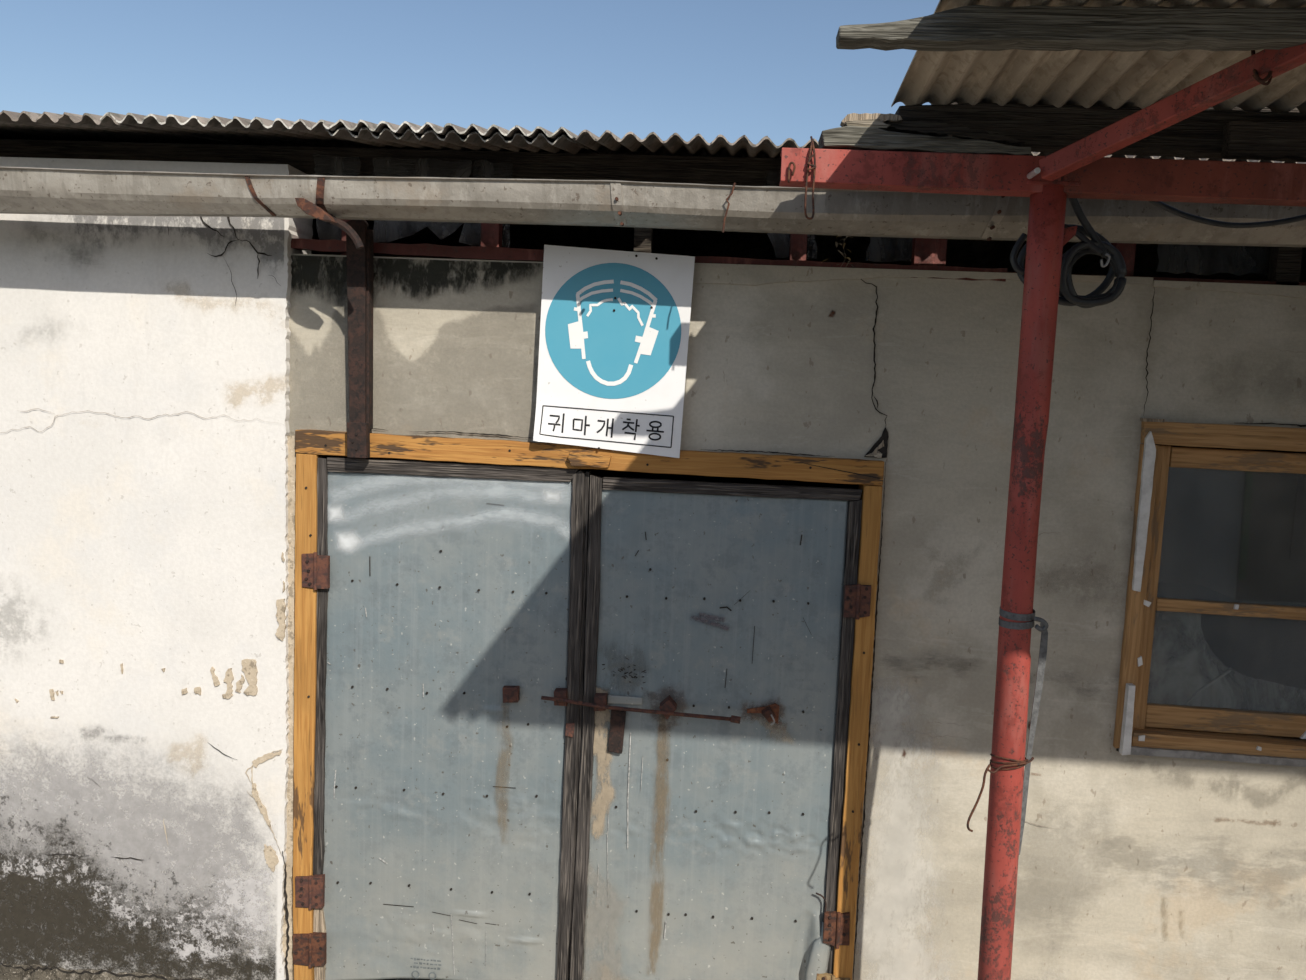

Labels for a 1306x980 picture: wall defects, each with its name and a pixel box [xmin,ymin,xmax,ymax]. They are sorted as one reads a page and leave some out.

crack [200,217,281,304]
leakage [291,255,347,302]
leakage [373,258,540,297]
crack [861,279,887,428]
crack [0,408,274,433]
peeling [181,659,258,699]
flaking render [252,436,296,980]
leakage [0,758,276,980]